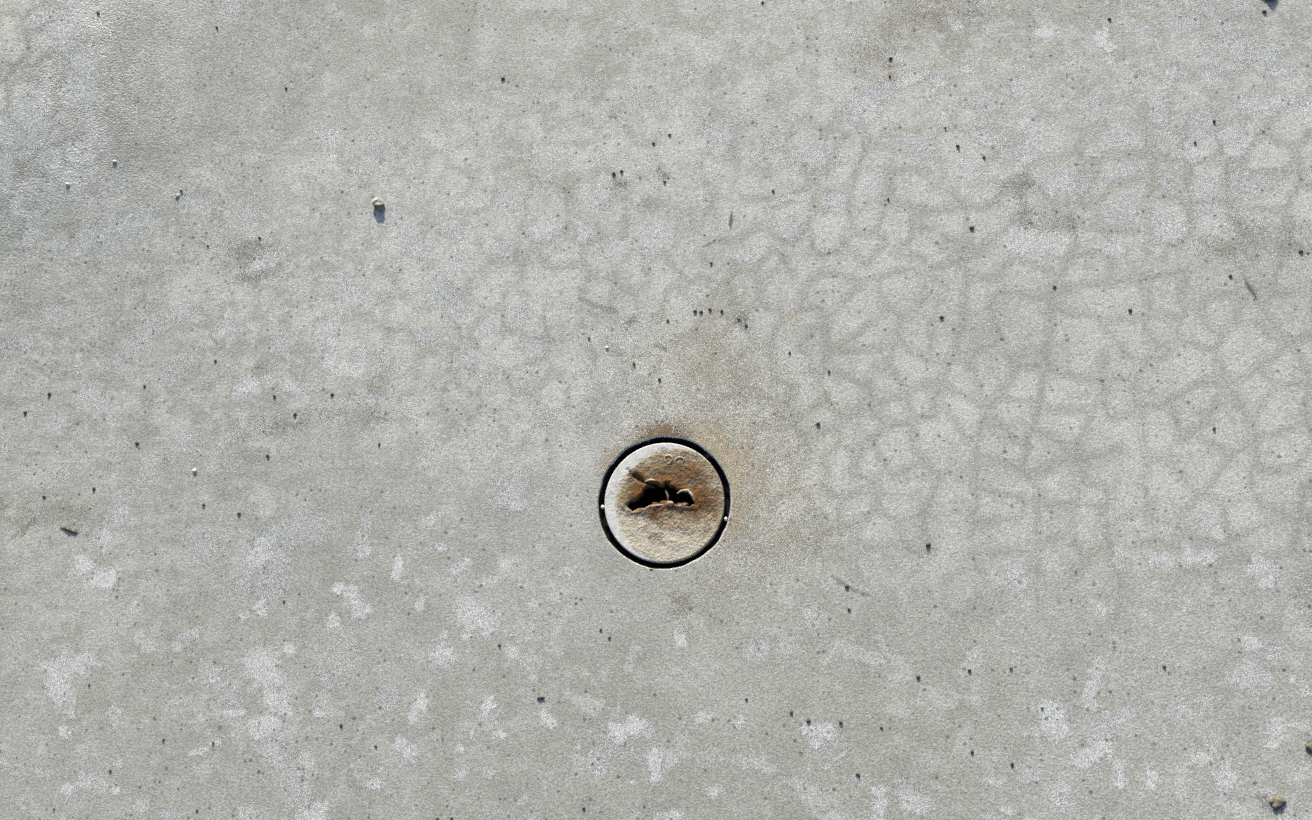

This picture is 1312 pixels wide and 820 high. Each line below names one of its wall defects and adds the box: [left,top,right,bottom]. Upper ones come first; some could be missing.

corrosion [588,269,866,647]